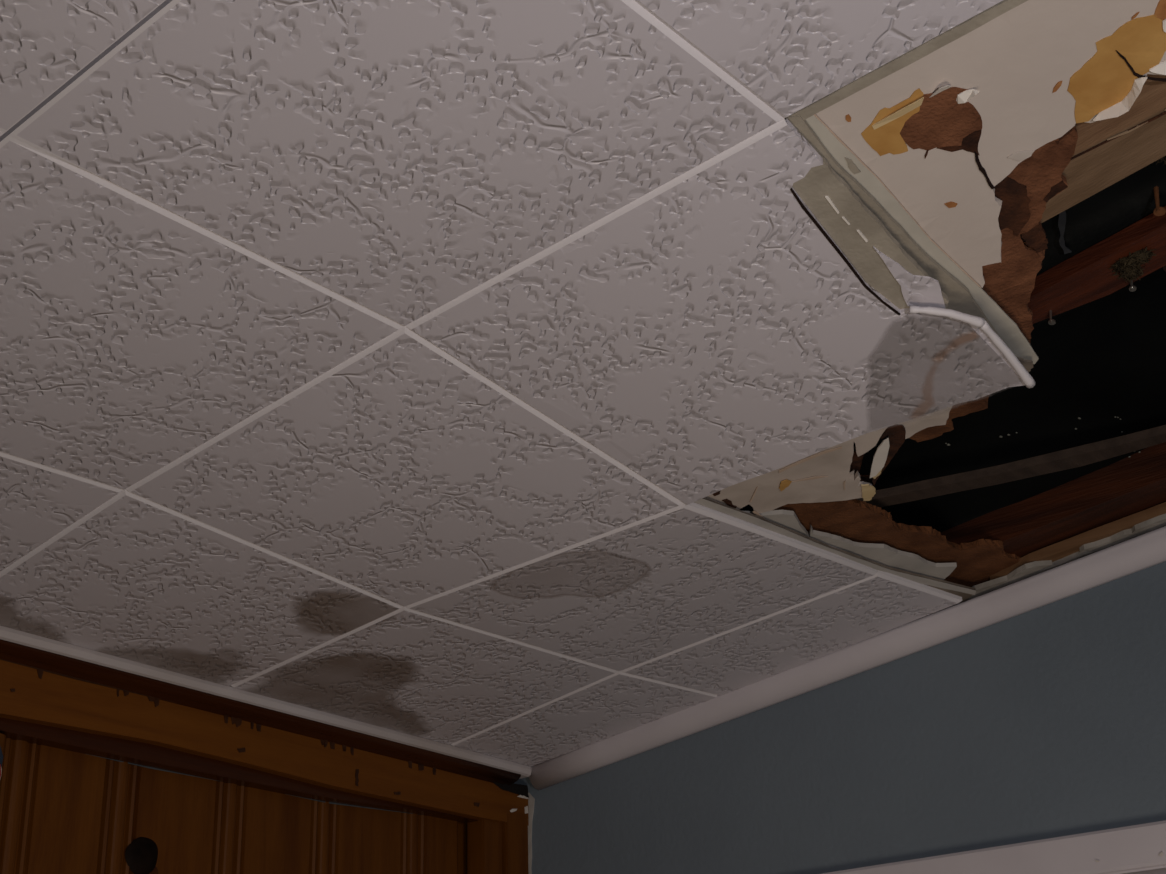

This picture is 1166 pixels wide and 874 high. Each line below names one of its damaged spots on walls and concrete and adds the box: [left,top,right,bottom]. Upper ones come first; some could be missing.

peeling [1052,0,1166,123]
peeling [861,85,982,156]
peeling [825,196,868,242]
leakage [301,593,355,634]
leakage [319,654,412,687]